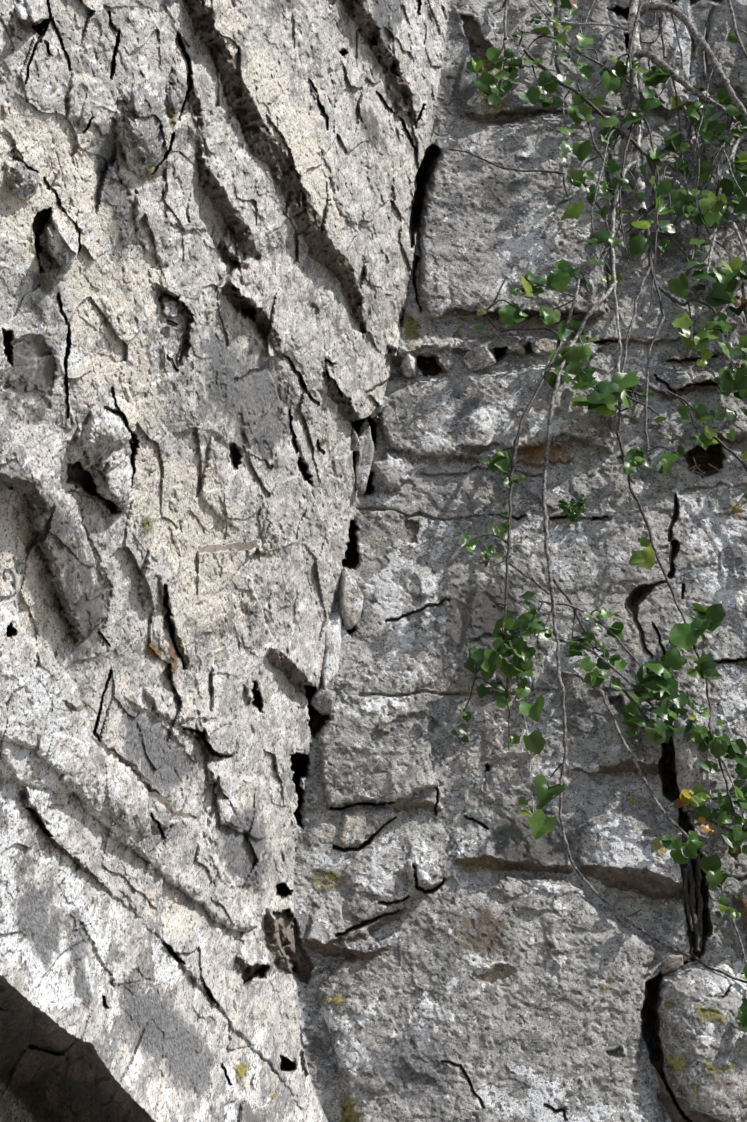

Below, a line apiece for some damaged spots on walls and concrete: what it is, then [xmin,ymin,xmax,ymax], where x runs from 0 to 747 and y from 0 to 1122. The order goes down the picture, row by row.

crack [25,0,72,84]
crack [376,92,438,310]
crack [57,293,71,418]
spalling [66,448,133,513]
crack [105,388,135,486]
crack [626,494,684,657]
crack [330,802,396,852]
spalling [272,909,314,984]
crack [642,736,711,1122]
crack [441,1061,484,1108]